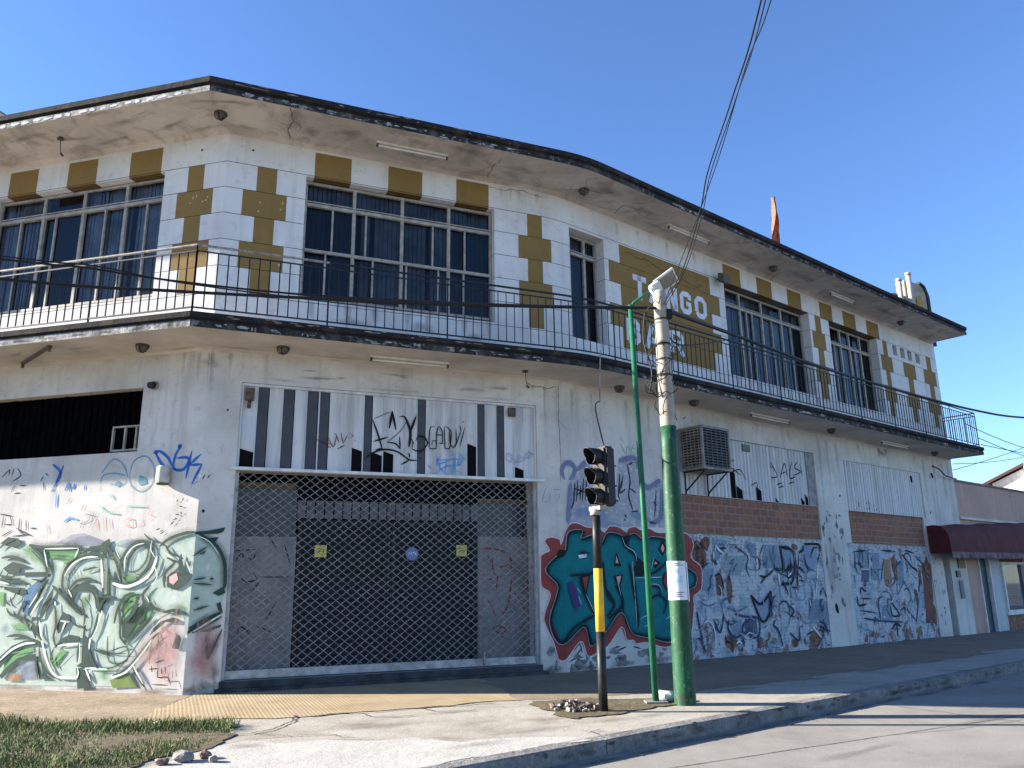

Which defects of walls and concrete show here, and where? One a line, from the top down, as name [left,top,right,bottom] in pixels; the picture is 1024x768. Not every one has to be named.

peeling [235,83,344,114]